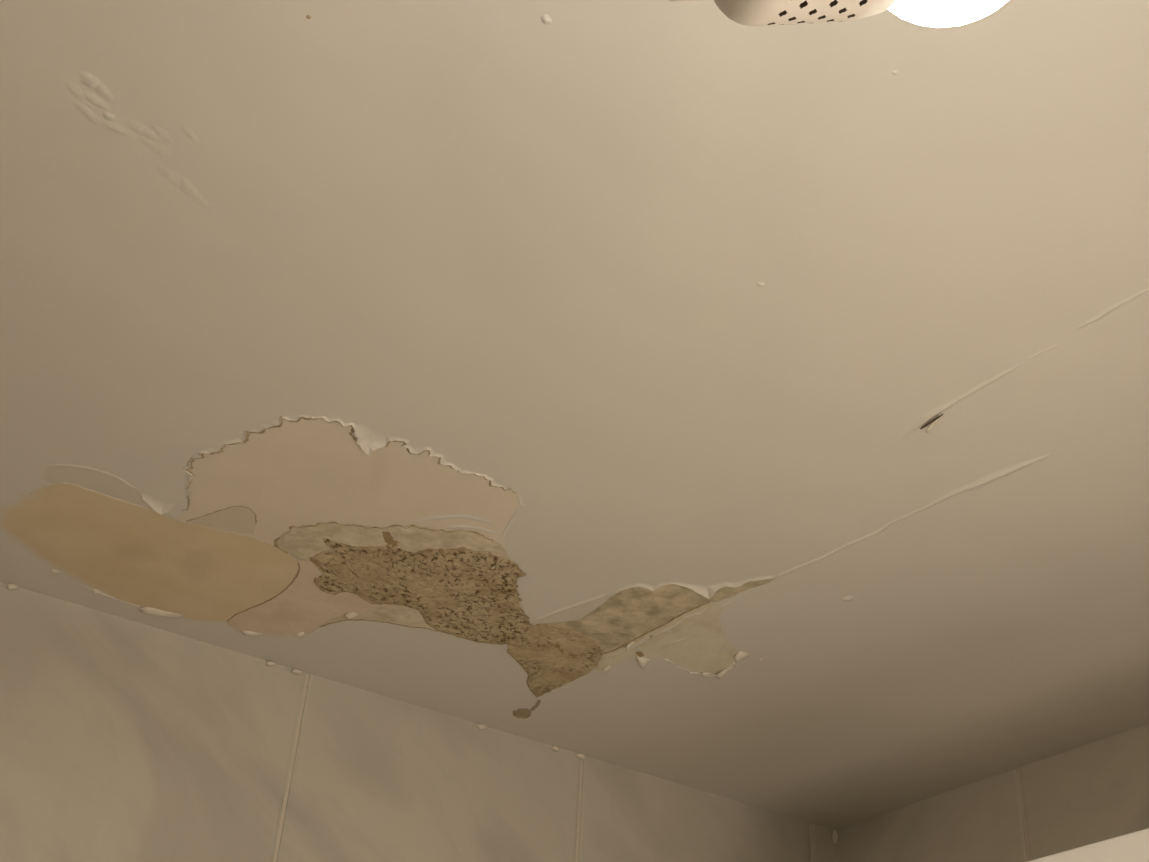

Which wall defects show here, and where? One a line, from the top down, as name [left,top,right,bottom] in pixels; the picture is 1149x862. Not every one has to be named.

crack [898,288,1149,441]
leakage [0,463,298,621]
peeling [176,415,778,697]
crack [778,453,1053,576]